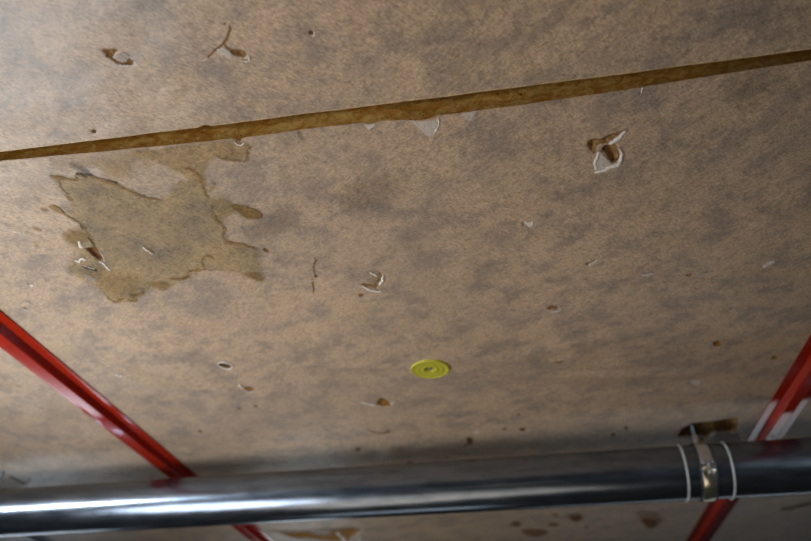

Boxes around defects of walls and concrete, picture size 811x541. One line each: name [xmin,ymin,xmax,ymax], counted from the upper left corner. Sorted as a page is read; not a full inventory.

damp [49,142,262,303]